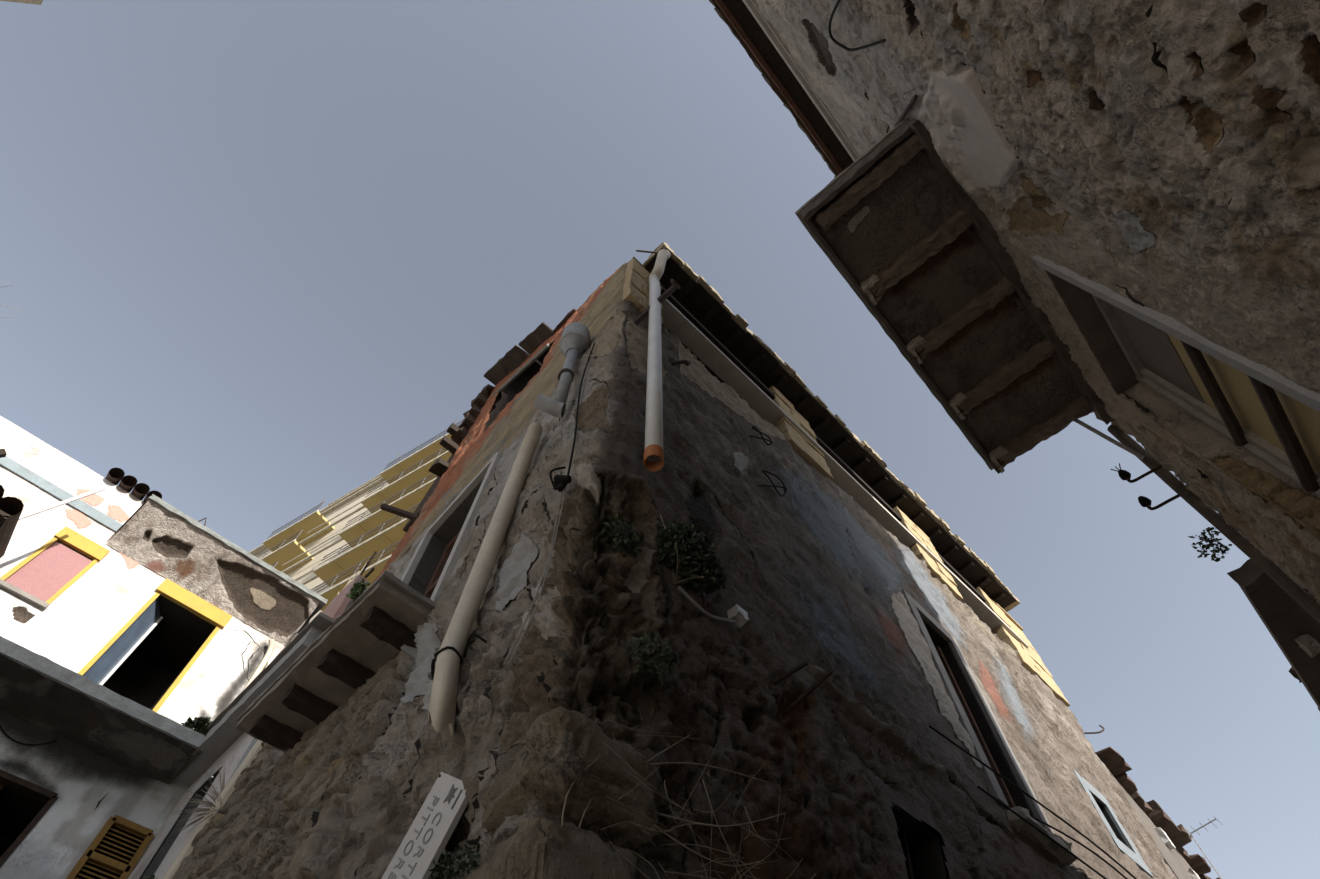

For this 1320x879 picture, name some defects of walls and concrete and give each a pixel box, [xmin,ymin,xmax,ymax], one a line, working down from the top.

spalling [951,3,972,40]
spalling [1186,51,1204,81]
spalling [1228,3,1266,76]
spalling [1300,34,1320,86]
spalling [1088,90,1104,110]
spalling [1179,96,1224,154]
spalling [1251,85,1290,127]
spalling [1006,173,1070,235]
crack [502,355,610,611]
spalling [143,530,193,558]
crack [461,466,497,575]
spalling [216,559,309,637]